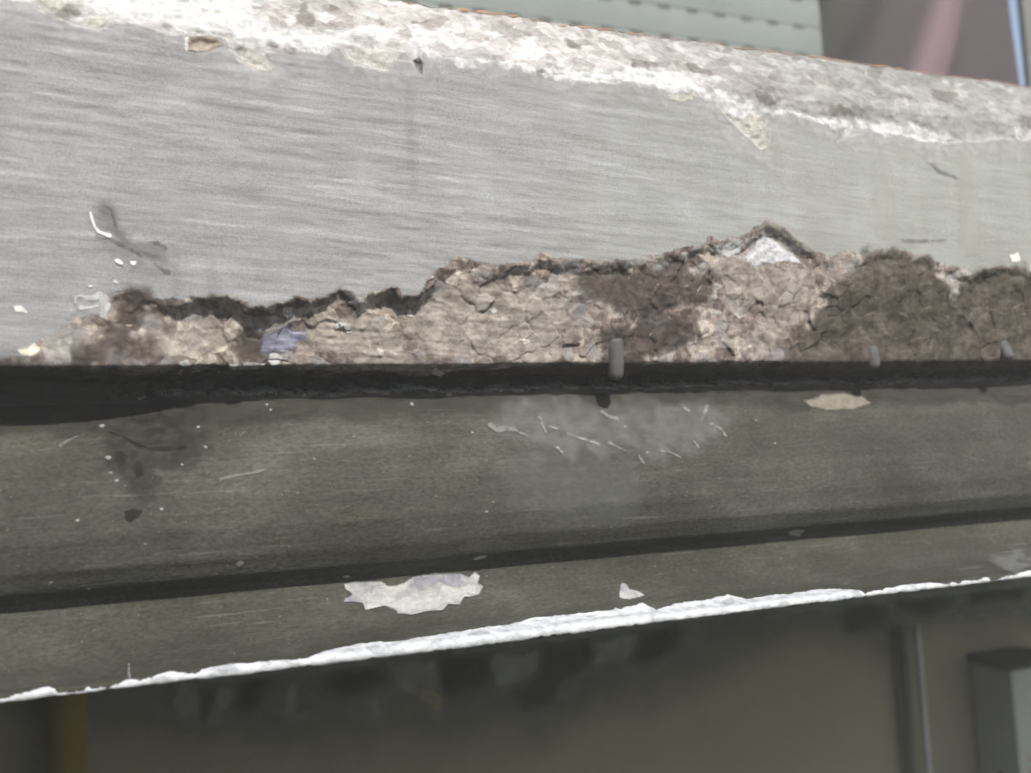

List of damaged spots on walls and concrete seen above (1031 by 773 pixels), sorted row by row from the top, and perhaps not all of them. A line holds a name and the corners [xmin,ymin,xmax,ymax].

spalling [10,0,1031,152]
spalling [0,225,1031,401]
peeling [343,555,487,615]
spalling [0,570,1031,721]
water stain [87,585,1031,734]